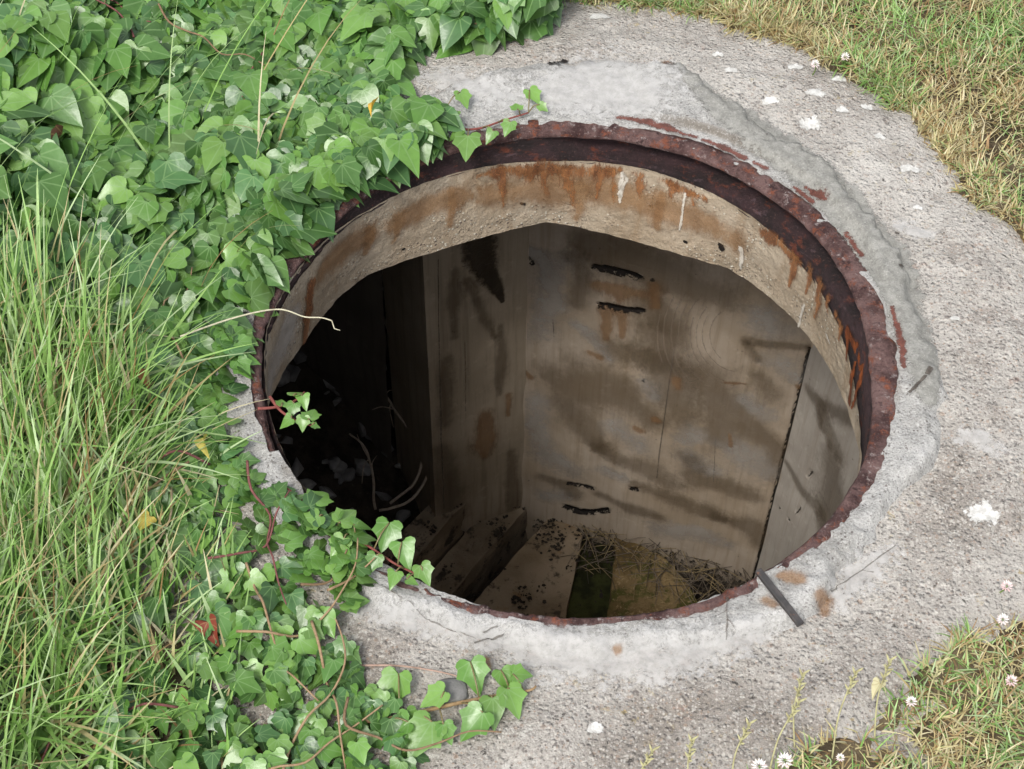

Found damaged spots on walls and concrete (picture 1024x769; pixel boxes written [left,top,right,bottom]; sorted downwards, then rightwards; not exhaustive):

rust [616,115,769,170]
rust [793,186,830,205]
water stain [461,235,505,303]
rust [303,159,740,345]
rust [759,228,864,409]
rust [890,305,907,368]
rust [777,571,804,583]
rust [816,591,830,615]